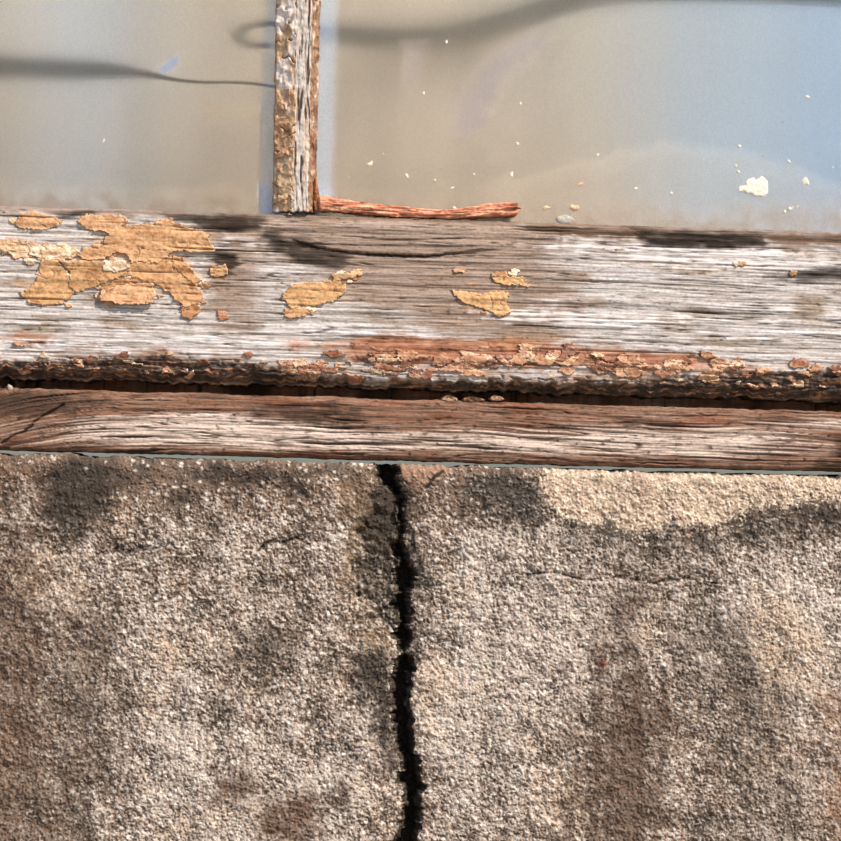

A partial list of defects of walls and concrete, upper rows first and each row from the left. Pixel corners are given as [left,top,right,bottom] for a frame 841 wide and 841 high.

peeling [0,211,228,320]
peeling [282,269,362,319]
peeling [451,268,531,318]
peeling [17,352,64,375]
peeling [71,351,149,374]
peeling [183,359,210,379]
peeling [243,342,580,383]
peeling [587,350,772,395]
peeling [788,358,841,388]
crack [355,464,427,841]